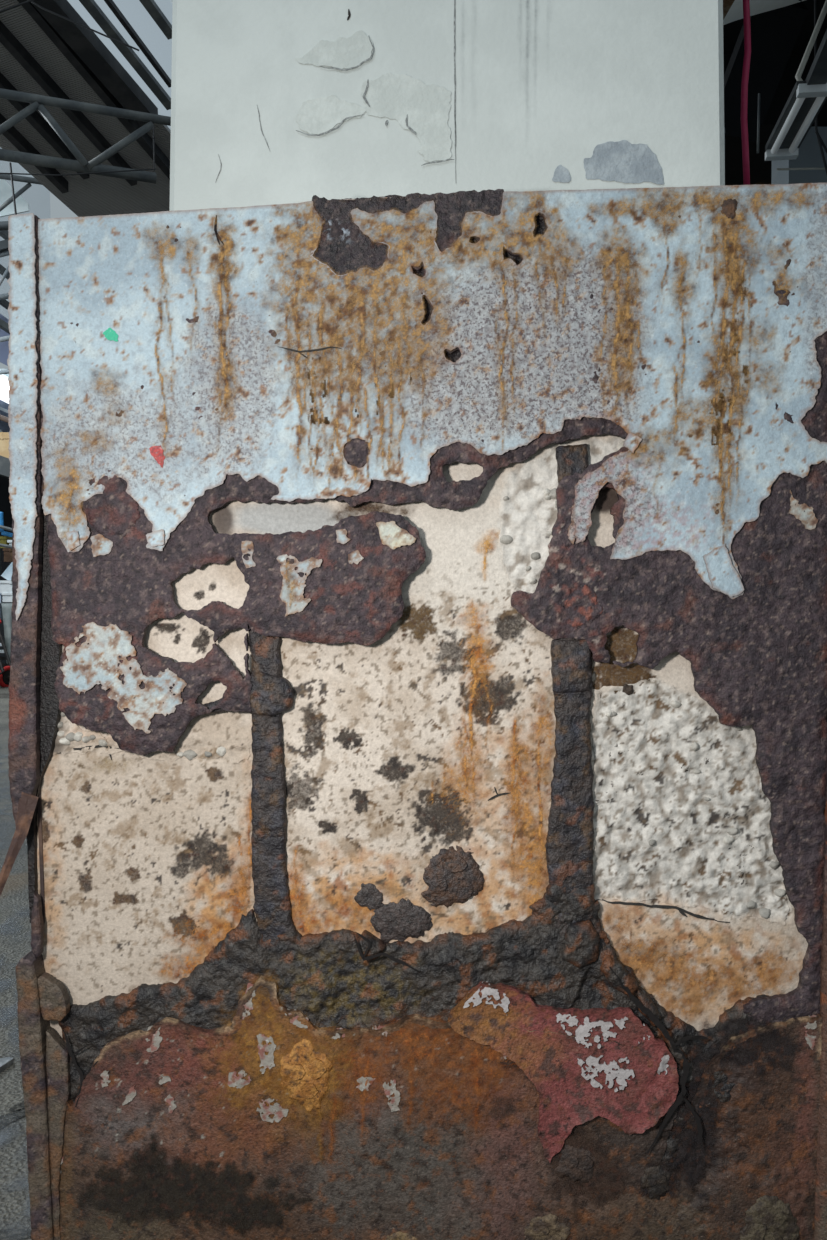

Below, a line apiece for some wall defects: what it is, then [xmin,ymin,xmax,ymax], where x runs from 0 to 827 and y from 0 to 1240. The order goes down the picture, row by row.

peeling [7,140,827,621]
corrosion [264,194,578,481]
corrosion [555,444,589,484]
corrosion [590,188,810,547]
corrosion [156,623,212,653]
corrosion [161,630,362,978]
corrosion [332,604,656,943]
crack [596,899,730,923]
peeling [227,1033,277,1089]
peeling [256,1098,289,1123]
peeling [356,1076,401,1112]
peeling [448,955,687,1162]